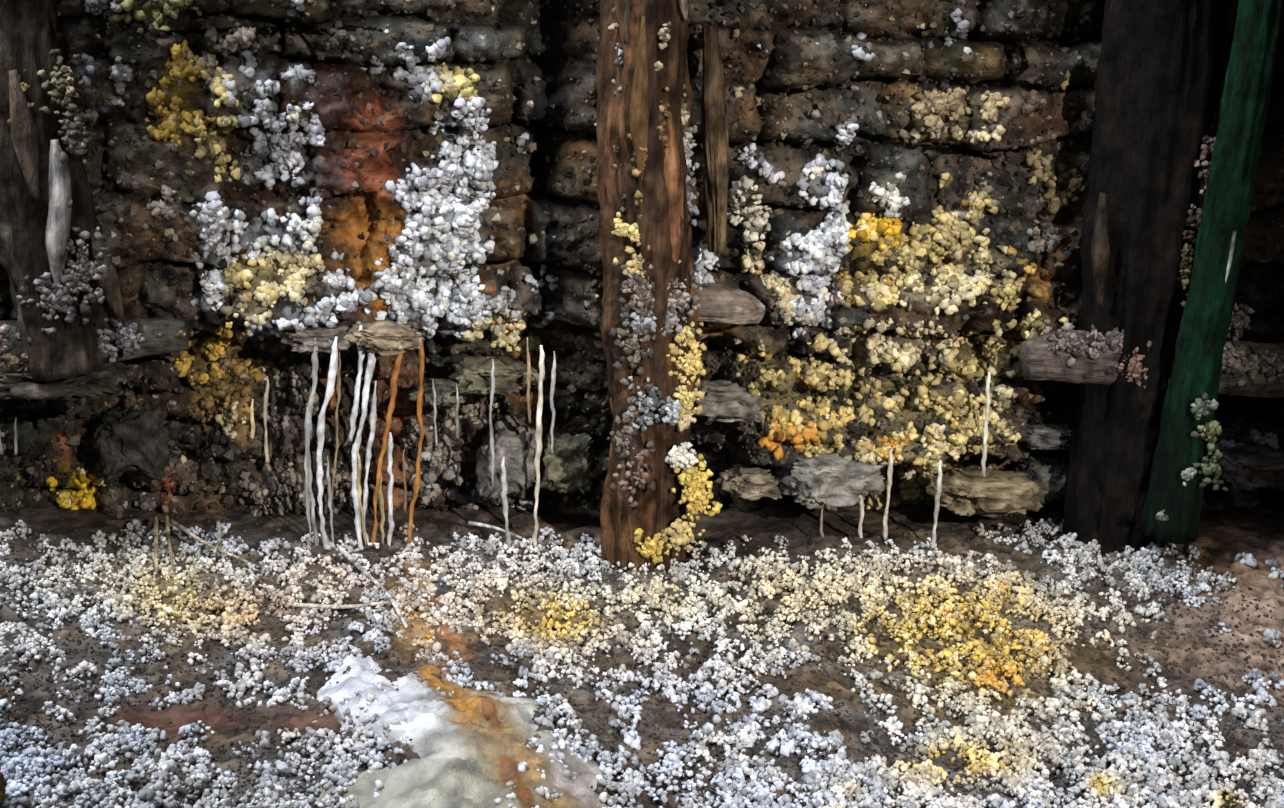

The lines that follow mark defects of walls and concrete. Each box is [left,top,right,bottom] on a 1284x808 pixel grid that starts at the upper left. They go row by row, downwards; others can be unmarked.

corrosion [300,57,405,324]